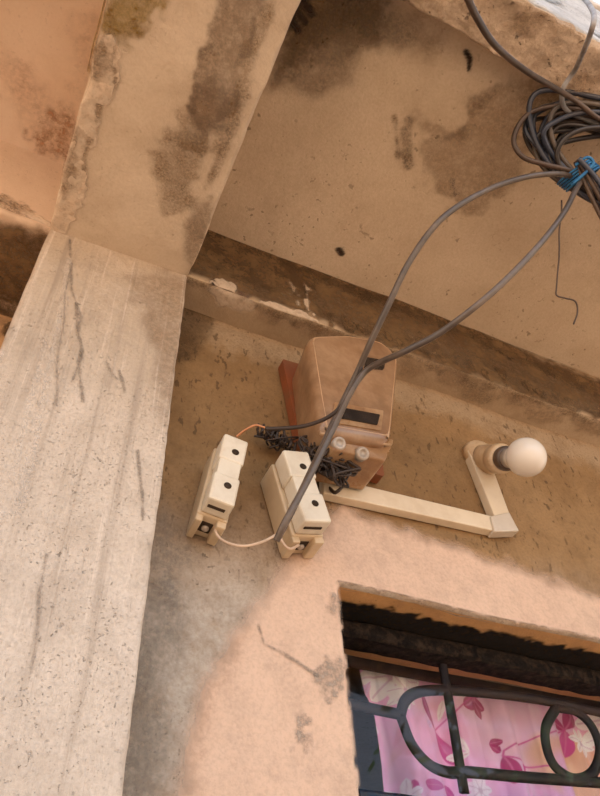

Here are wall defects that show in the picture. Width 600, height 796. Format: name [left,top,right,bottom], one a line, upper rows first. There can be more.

water stain [88,0,166,69]
water stain [0,224,47,318]
peeling [0,35,120,234]
water stain [155,0,600,420]